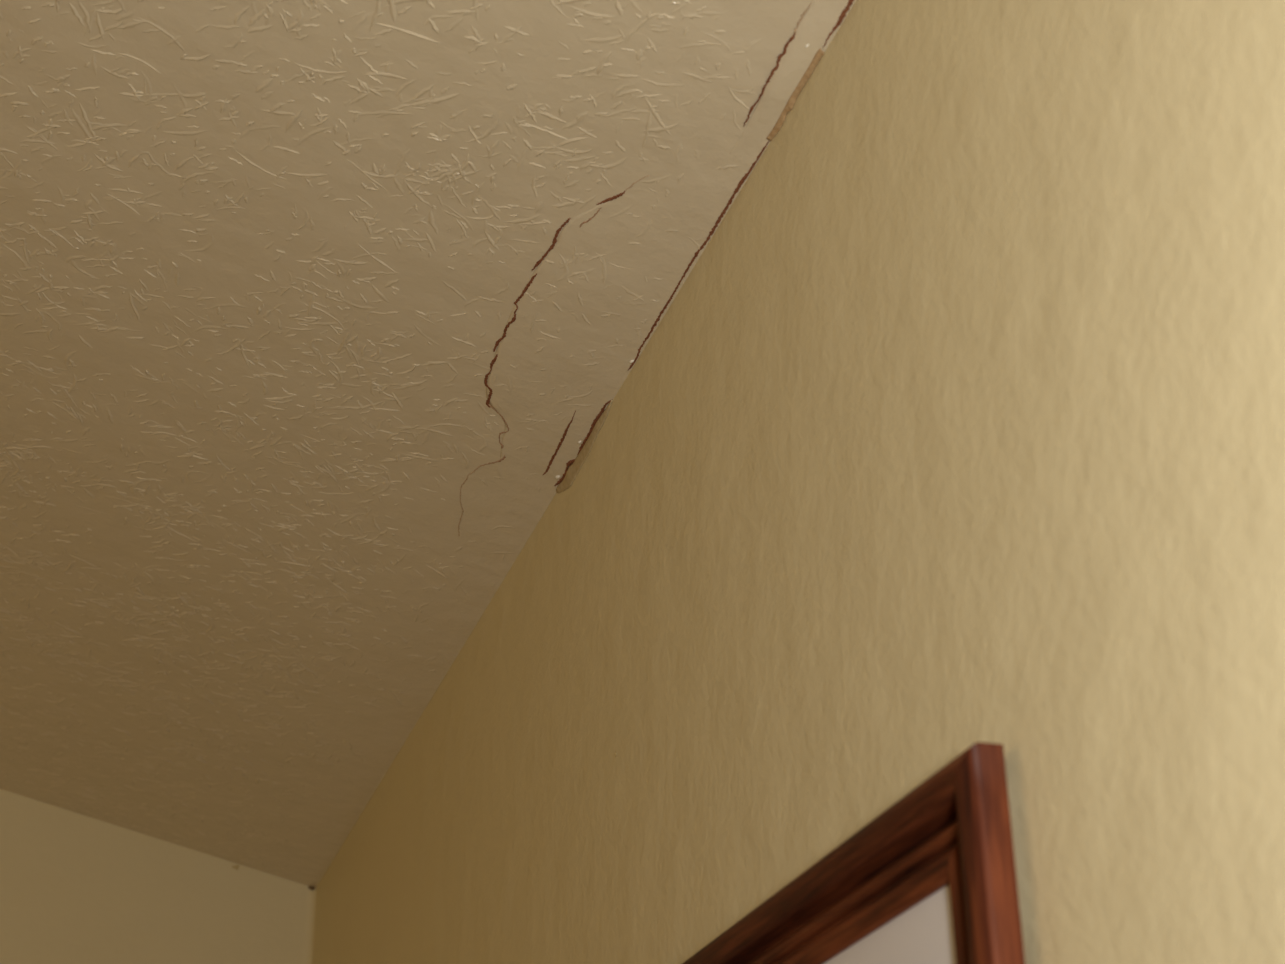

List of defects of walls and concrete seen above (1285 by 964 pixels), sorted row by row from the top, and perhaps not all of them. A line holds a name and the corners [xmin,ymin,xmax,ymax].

crack [458,175,649,536]
crack [628,0,854,370]